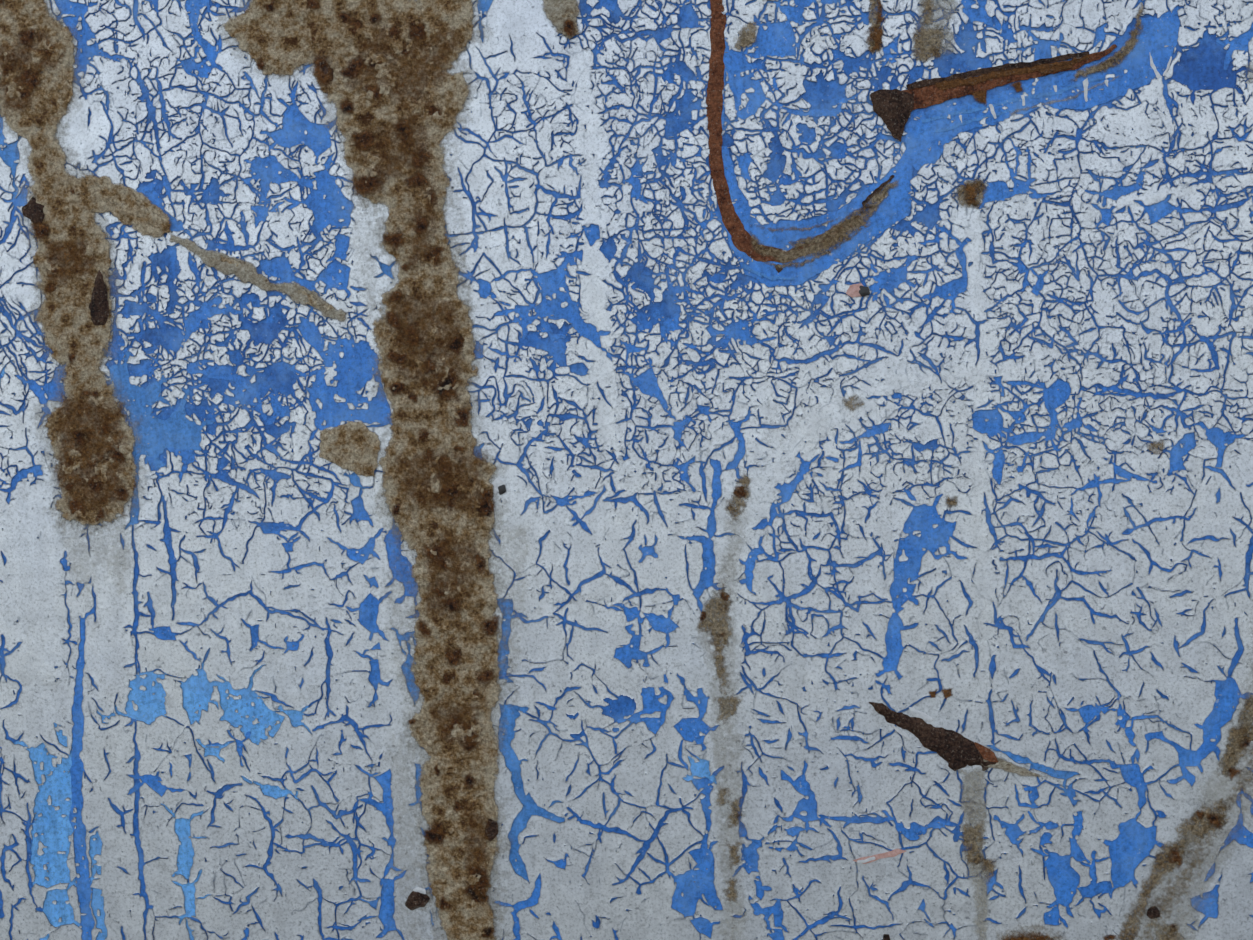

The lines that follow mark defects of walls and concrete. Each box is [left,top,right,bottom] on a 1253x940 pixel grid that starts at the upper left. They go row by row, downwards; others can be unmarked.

rust [0,0,346,525]
crack [92,439,392,940]
peeling [241,72,366,298]
rust [223,0,501,940]
rust [543,0,579,39]
crack [475,357,710,885]
peeling [455,221,751,940]
crack [576,75,1253,430]
spalling [724,0,1253,171]
peeling [869,487,1253,927]
crack [924,473,1253,808]
rust [1104,694,1253,940]